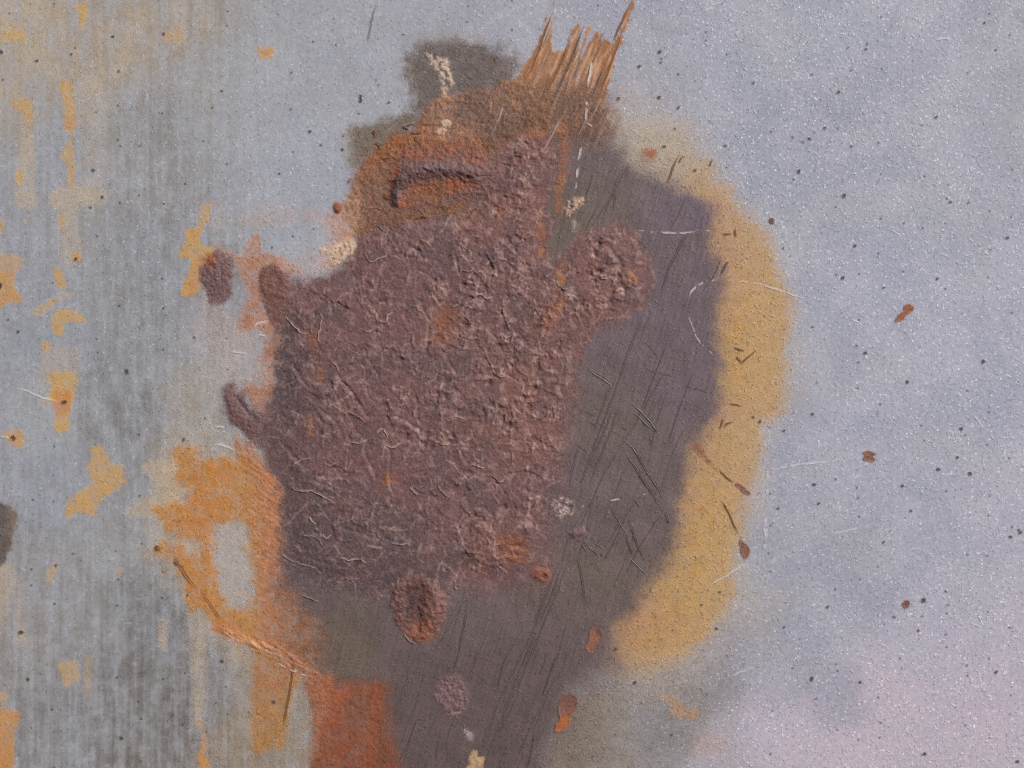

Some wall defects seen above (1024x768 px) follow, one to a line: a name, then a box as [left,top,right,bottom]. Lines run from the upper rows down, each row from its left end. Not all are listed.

corrosion [60,82,75,186]
leakage [343,33,518,167]
corrosion [0,254,21,306]
corrosion [53,311,83,335]
corrosion [47,373,75,432]
corrosion [154,0,789,768]
corrosion [7,430,23,447]
corrosion [66,448,122,517]